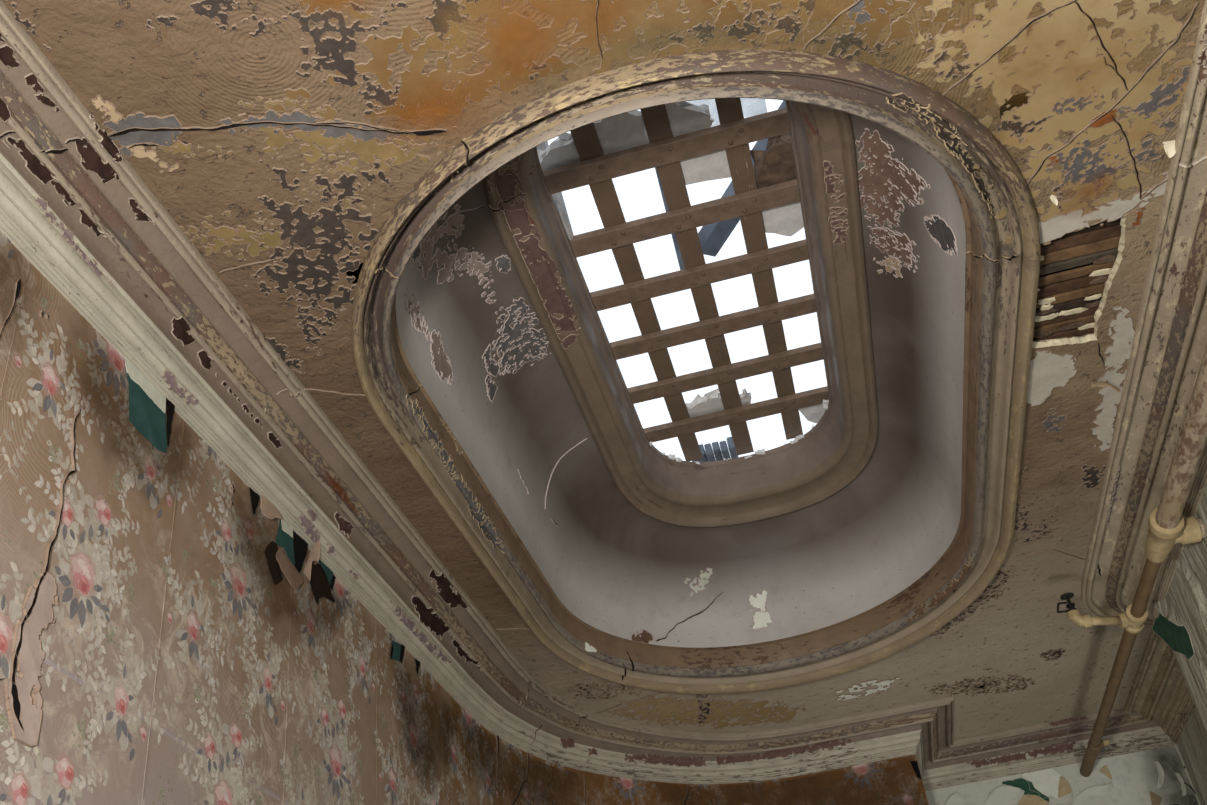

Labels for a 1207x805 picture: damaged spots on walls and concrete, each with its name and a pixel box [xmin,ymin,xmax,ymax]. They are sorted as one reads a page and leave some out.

peeling [74,95,233,184]
crack [0,120,471,182]
crack [942,0,1207,200]
peeling [128,198,155,225]
flaking render [125,357,199,413]
crack [0,409,80,731]
peeling [390,569,486,672]
crack [656,591,724,642]
peeling [1151,595,1207,691]
crack [572,650,663,730]
crack [496,688,543,805]
flaking render [967,741,1076,805]